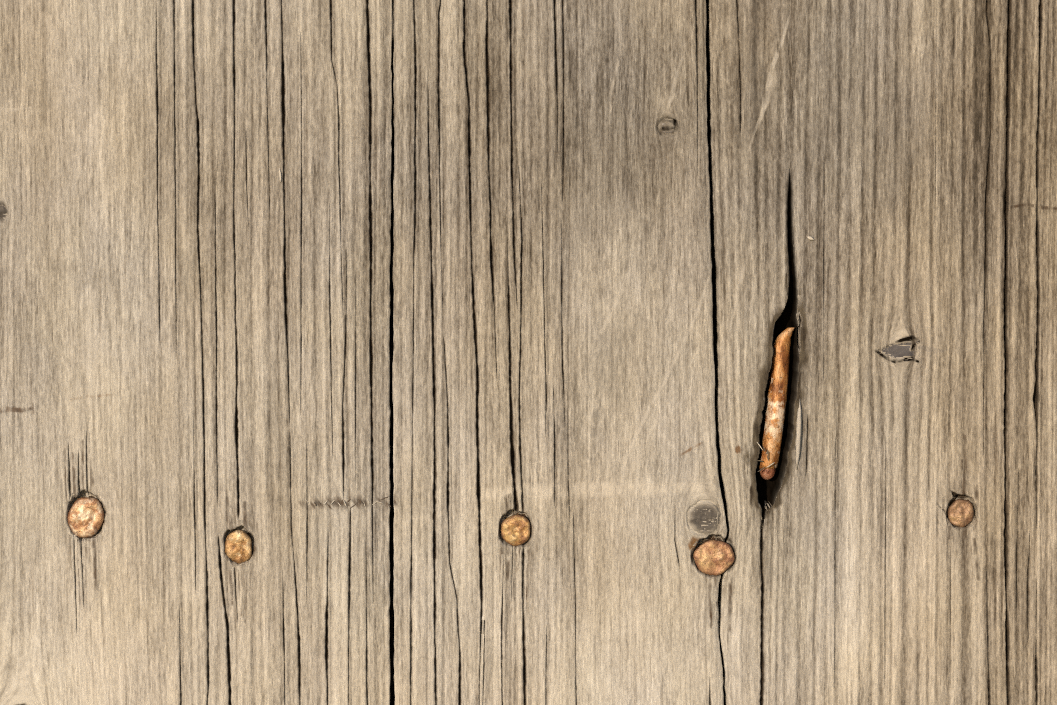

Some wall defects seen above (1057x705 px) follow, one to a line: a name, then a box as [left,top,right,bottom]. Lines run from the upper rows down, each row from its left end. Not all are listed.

crack [153,0,376,705]
crack [407,0,580,705]
crack [981,0,1045,705]
corrosion [54,438,112,612]
corrosion [214,494,265,625]
corrosion [487,493,544,610]
corrosion [683,509,743,633]
crack [937,488,974,688]
corrosion [938,432,983,598]
crack [706,672,714,705]